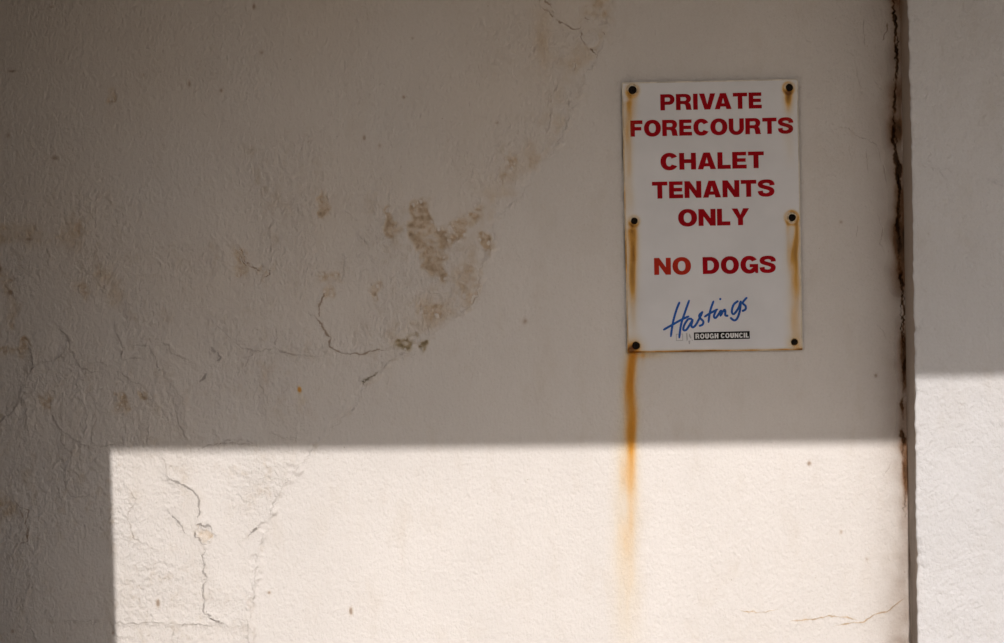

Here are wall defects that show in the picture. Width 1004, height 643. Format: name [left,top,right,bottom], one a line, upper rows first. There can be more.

crack [891,0,908,489]